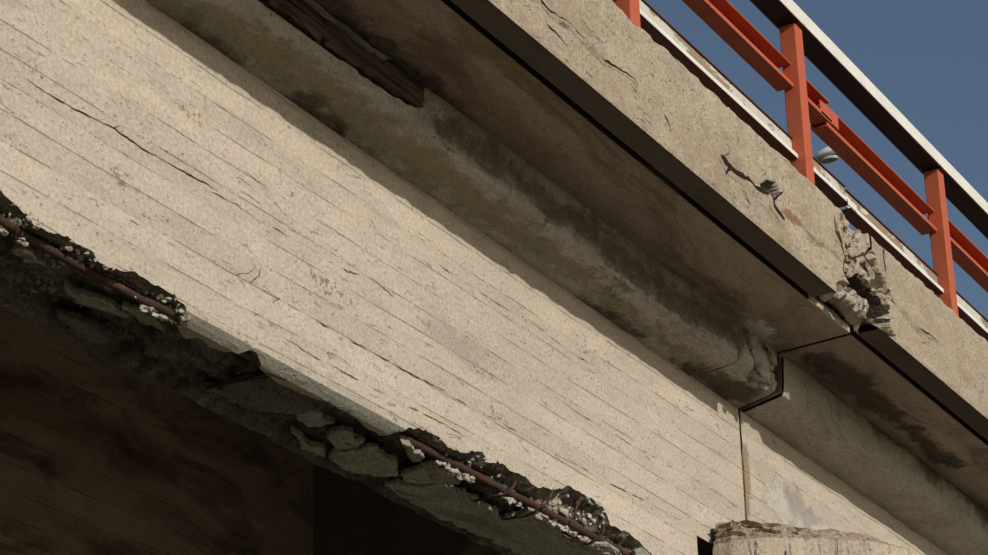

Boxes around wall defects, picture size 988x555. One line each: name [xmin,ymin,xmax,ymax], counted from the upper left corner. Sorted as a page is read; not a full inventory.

crack [531,0,638,90]
crack [26,78,397,306]
crack [719,132,844,262]
spalling [807,210,896,340]
spalling [0,190,652,555]
water stain [681,363,759,409]
water stain [735,318,777,379]
water stain [803,353,965,468]